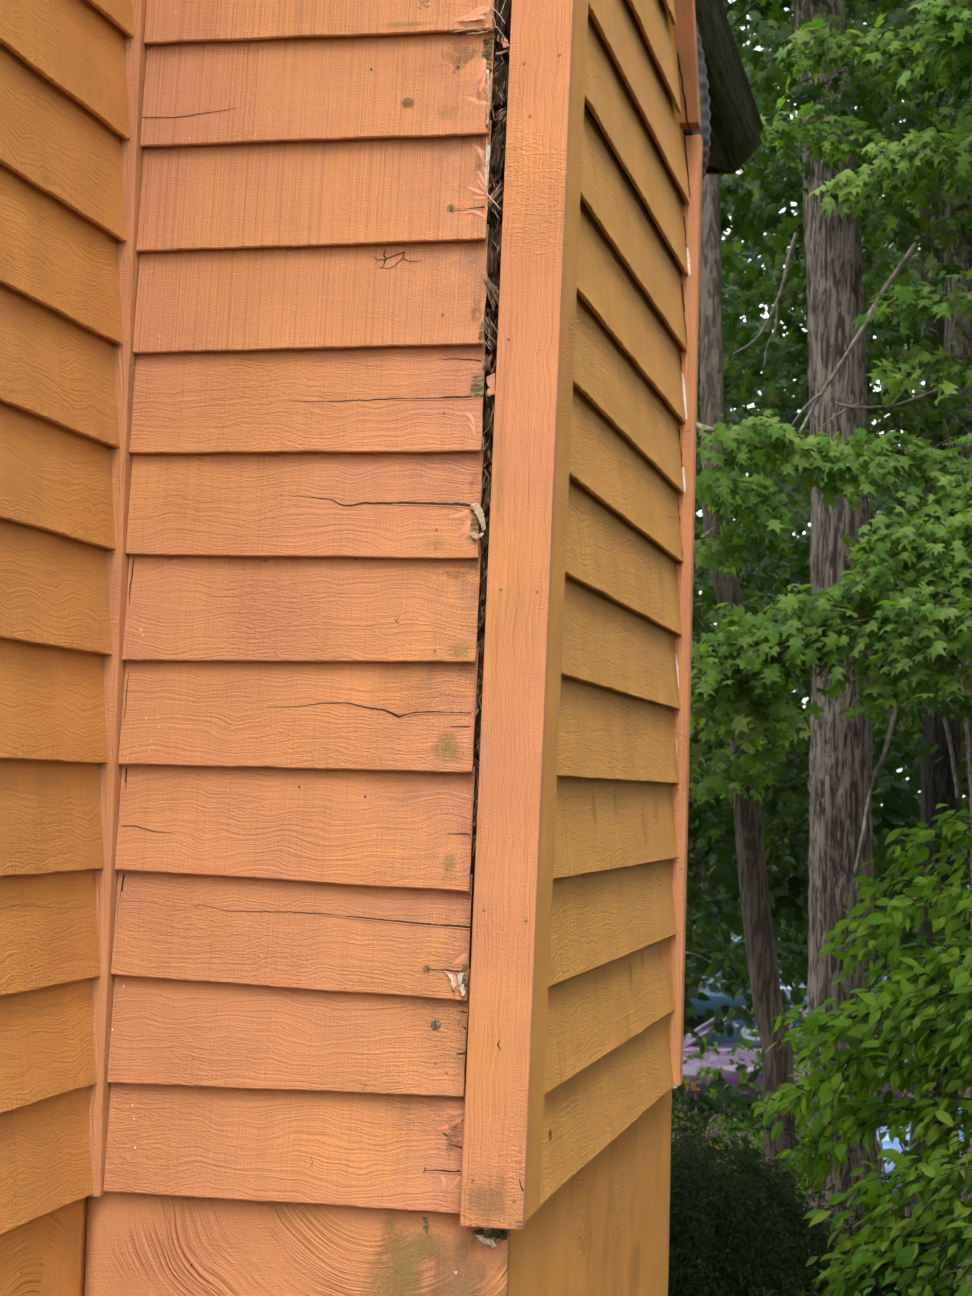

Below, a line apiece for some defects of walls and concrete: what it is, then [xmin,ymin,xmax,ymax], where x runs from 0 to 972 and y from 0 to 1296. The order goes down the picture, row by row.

crack [301,394,483,402]
crack [290,495,471,509]
crack [290,702,471,728]
crack [199,904,470,930]